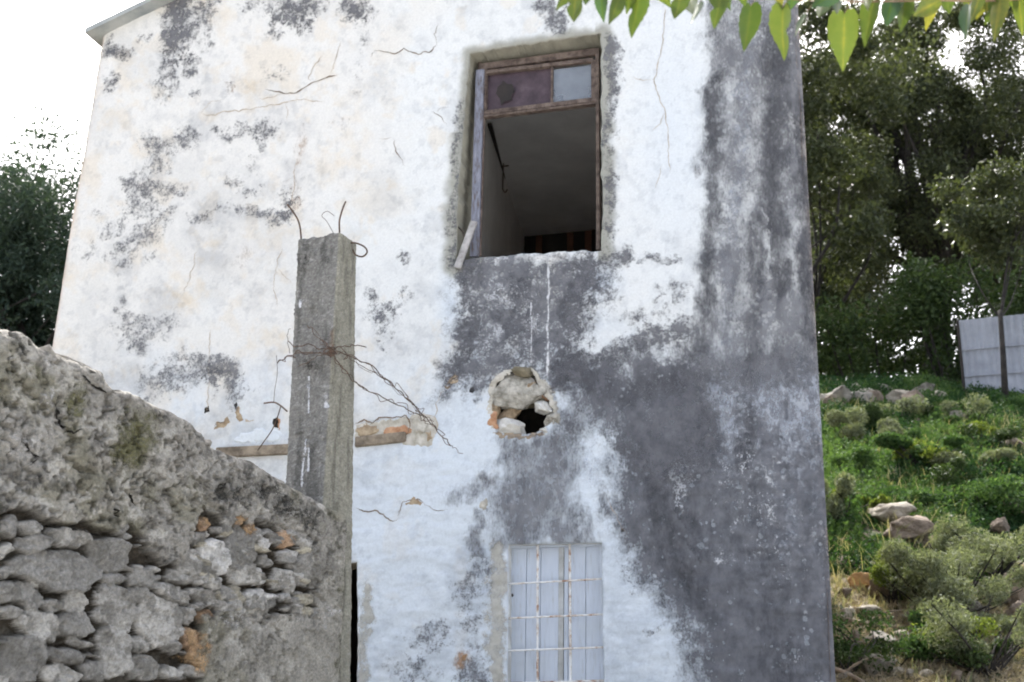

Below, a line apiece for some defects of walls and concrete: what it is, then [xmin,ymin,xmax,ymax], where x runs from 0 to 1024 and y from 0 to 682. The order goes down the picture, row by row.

water stain [141,0,221,97]
crack [204,41,341,116]
water stain [268,0,325,38]
water stain [339,0,374,22]
crack [374,25,438,55]
crack [635,10,671,187]
water stain [100,125,198,267]
water stain [435,0,836,682]
water stain [140,347,249,410]
spalling [354,413,439,447]
spalling [486,366,561,440]
crack [357,498,447,521]